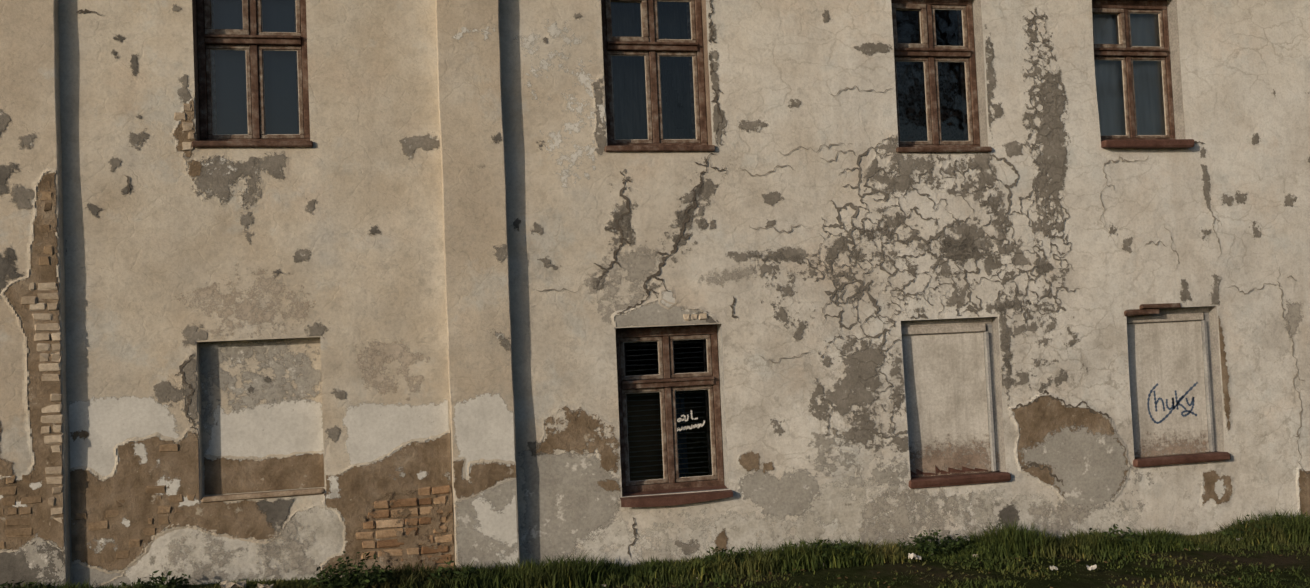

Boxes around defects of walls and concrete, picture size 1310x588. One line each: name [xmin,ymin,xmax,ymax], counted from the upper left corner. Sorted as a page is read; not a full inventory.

peeling [169,74,289,245]
spalling [0,109,621,588]
peeling [590,73,610,158]
crack [537,0,1148,446]
spalling [736,7,1153,522]
crack [1145,227,1180,269]
crack [1210,210,1304,467]
spalling [1199,465,1236,510]
spalling [1295,466,1310,515]